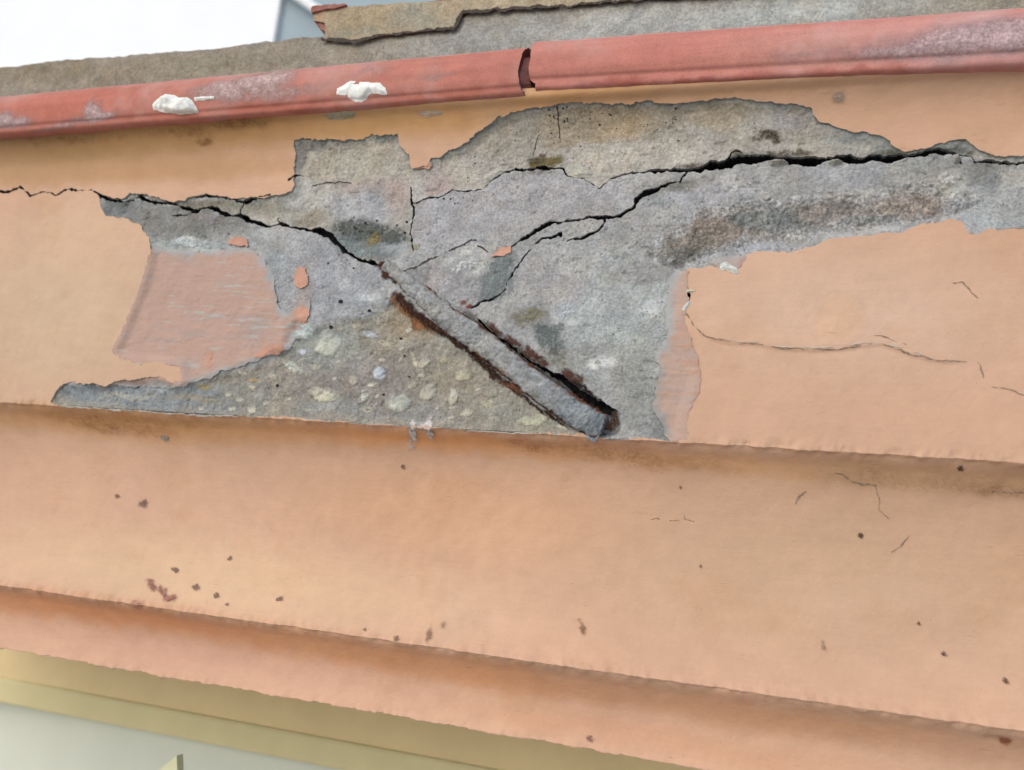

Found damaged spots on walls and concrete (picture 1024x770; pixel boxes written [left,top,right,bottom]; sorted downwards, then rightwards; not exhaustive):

crack [0,175,378,266]
spalling [52,97,1024,444]
crack [404,106,1024,414]
rust [375,261,567,427]
rust [557,368,602,401]
rust [606,409,619,431]
crack [835,473,890,519]